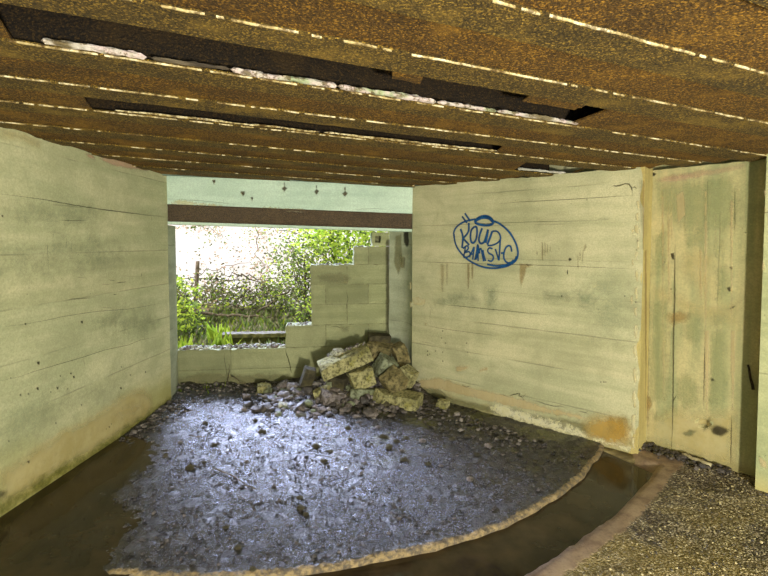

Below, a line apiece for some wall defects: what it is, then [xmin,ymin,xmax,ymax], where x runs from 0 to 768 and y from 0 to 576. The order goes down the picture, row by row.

corrosion [150,0,768,121]
corrosion [16,129,521,196]
corrosion [0,56,730,173]
leakage [6,394,150,495]
leakage [422,387,631,452]